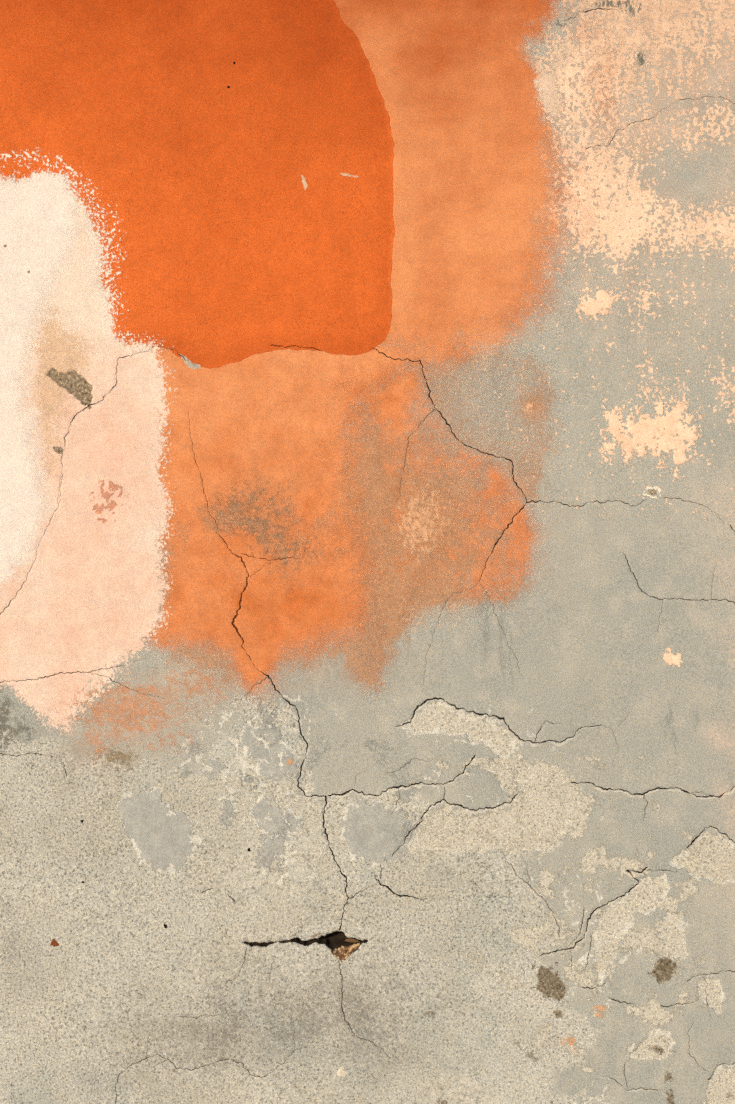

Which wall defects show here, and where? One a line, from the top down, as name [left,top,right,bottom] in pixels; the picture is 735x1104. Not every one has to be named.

peeling [478,0,735,524]
crack [0,346,197,614]
crack [375,349,735,761]
crack [188,417,519,930]
flaking render [174,695,735,1061]
crack [503,826,735,1004]
crack [571,782,735,822]
crack [113,960,390,1104]
crack [611,1035,658,1092]
crack [660,970,735,1081]
flaking render [702,1062,735,1104]